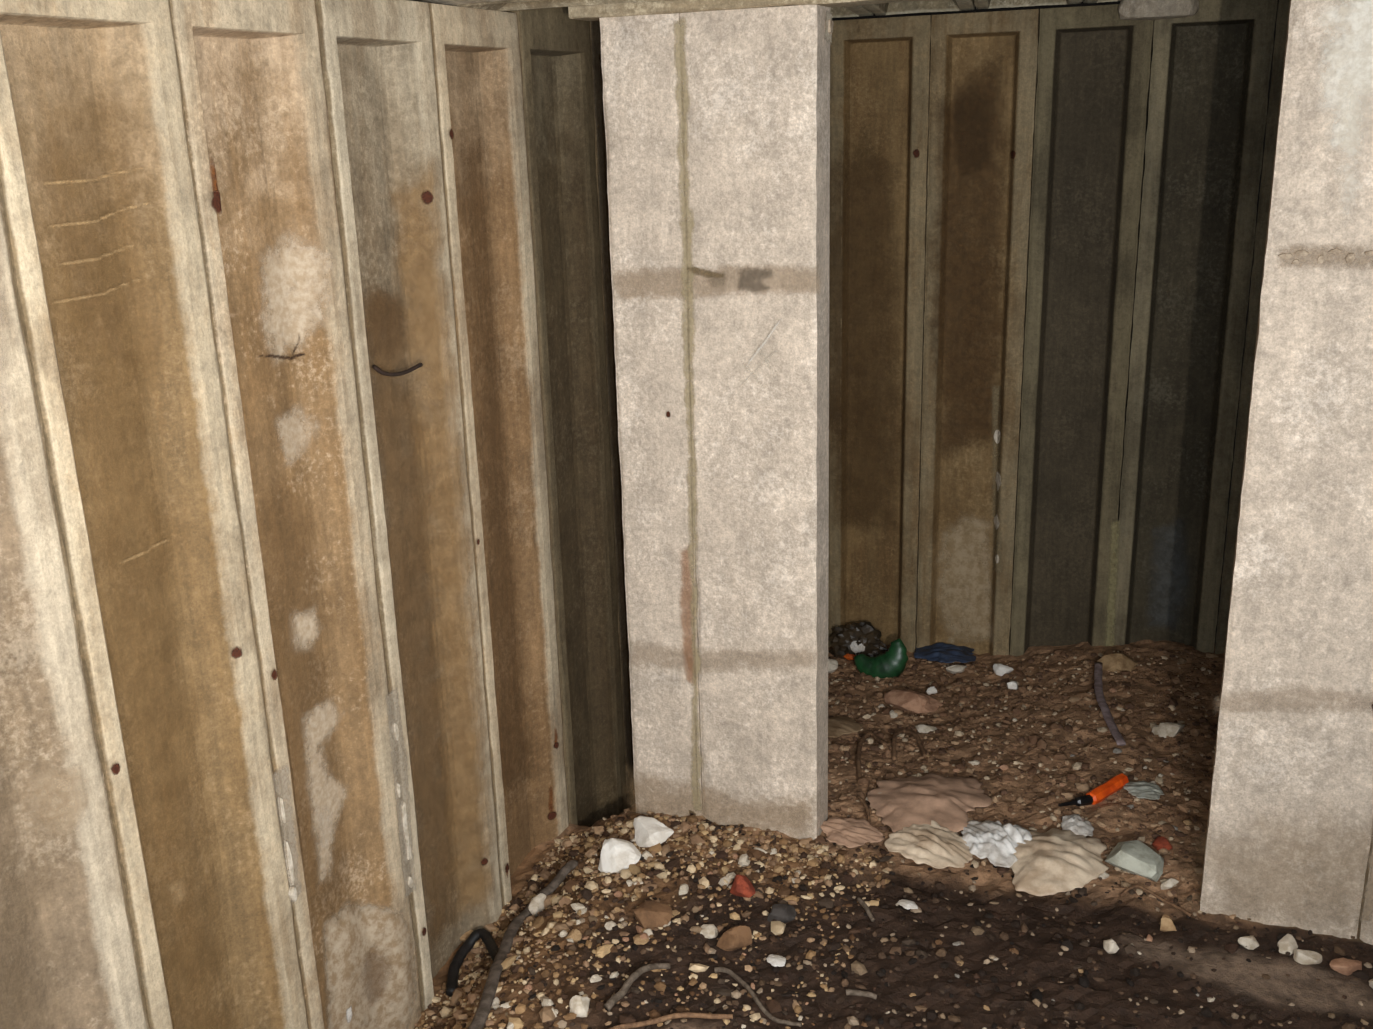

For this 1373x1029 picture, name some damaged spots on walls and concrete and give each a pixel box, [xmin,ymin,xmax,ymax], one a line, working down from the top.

rust [211,164,222,213]
damp [264,239,331,358]
damp [740,269,770,291]
damp [934,76,999,446]
damp [278,411,310,460]
damp [294,612,317,646]
damp [306,702,345,879]